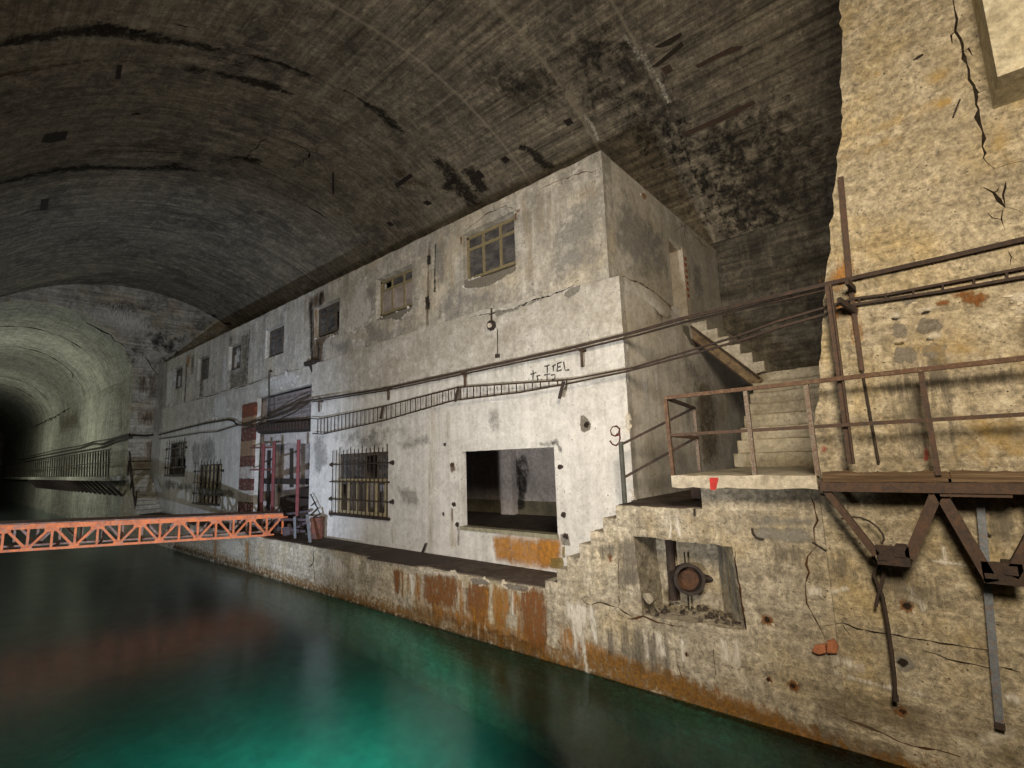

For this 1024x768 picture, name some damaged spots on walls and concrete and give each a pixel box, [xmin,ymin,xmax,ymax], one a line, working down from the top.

water stain [432,158,487,206]
efflorescence [623,36,670,103]
crack [950,0,1023,265]
crack [471,280,580,318]
corrosion [173,537,922,768]
crack [805,489,1019,672]